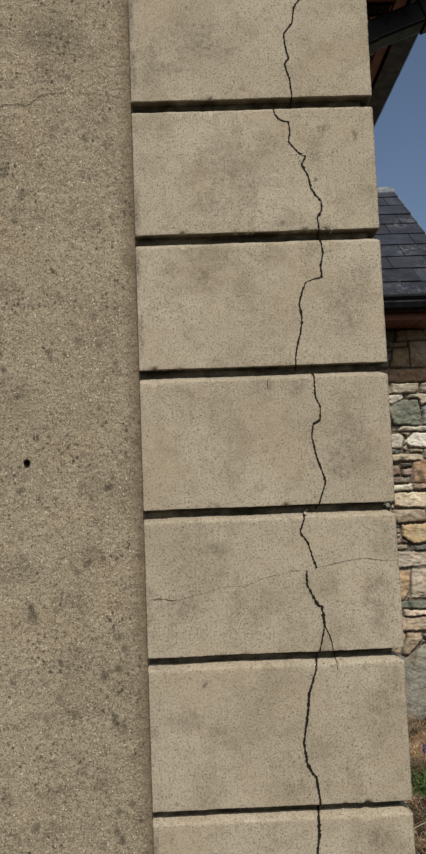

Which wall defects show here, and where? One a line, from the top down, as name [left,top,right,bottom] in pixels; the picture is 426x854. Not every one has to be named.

crack [152,0,384,854]